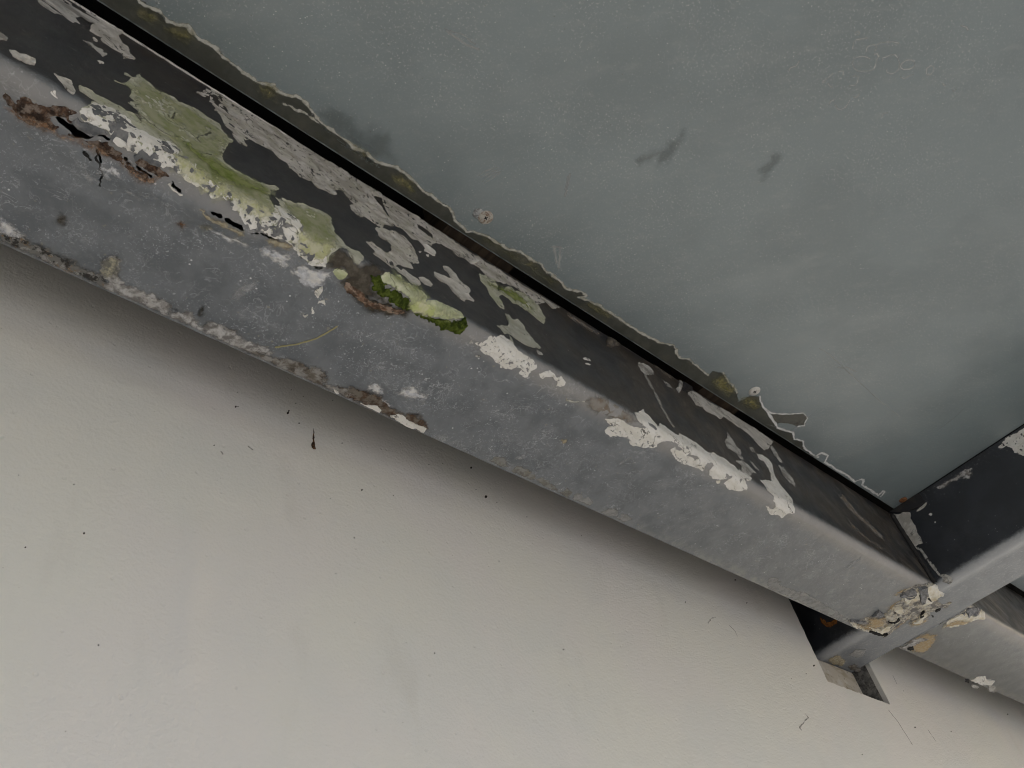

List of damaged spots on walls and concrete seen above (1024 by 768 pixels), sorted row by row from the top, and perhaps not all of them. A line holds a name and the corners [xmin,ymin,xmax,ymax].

corrosion [2,93,169,184]
water stain [0,218,272,355]
peeling [38,0,566,387]
water stain [99,0,885,497]
peeling [245,350,354,398]
corrosion [334,383,428,433]
peeling [605,362,795,518]
peeling [998,428,1024,456]
peeling [849,502,953,634]
peeling [962,607,981,618]